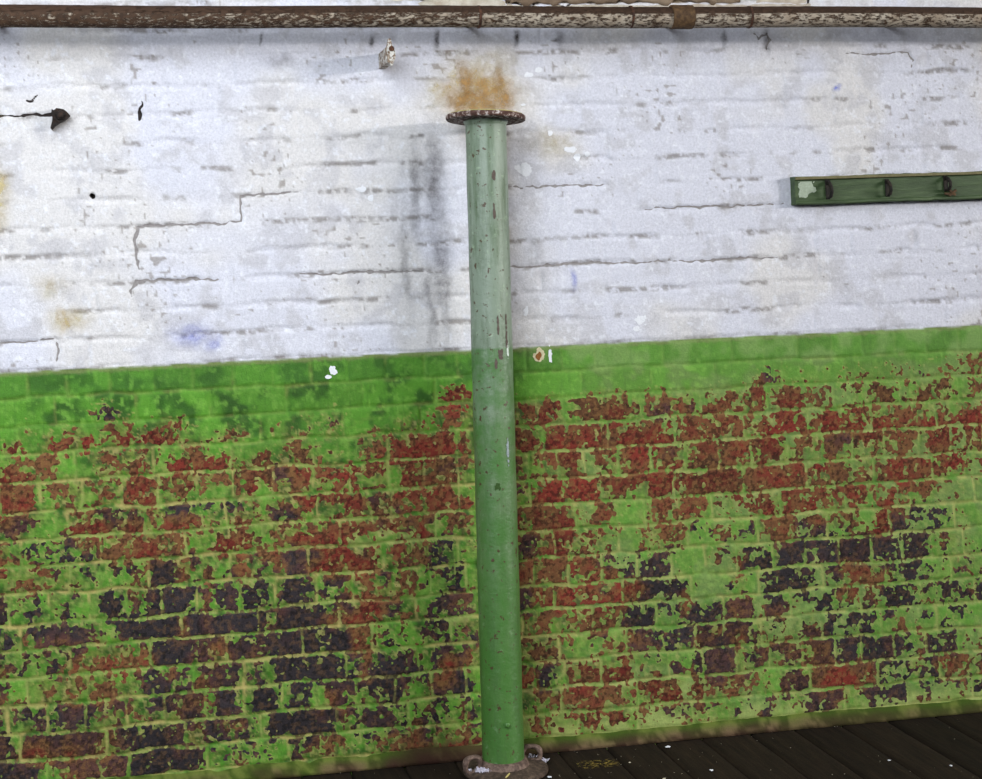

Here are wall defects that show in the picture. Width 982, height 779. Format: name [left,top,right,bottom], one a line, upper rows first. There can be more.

crack [0,95,52,118]
rust [449,70,510,111]
peeling [0,383,482,779]
peeling [515,352,982,737]